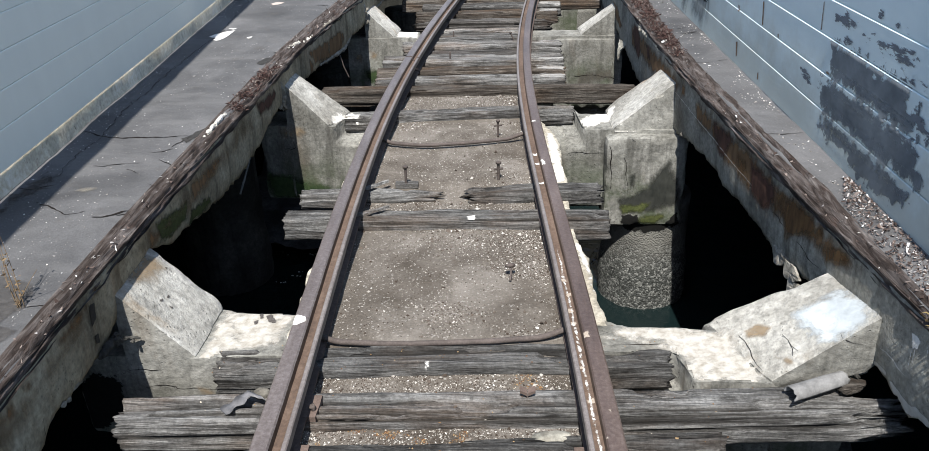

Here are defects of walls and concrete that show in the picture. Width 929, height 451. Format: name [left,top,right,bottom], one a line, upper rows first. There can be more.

crack [26,2,249,217]
damp [618,162,679,233]
rust [614,0,929,331]
peeling [772,243,801,290]
peeling [800,10,929,209]